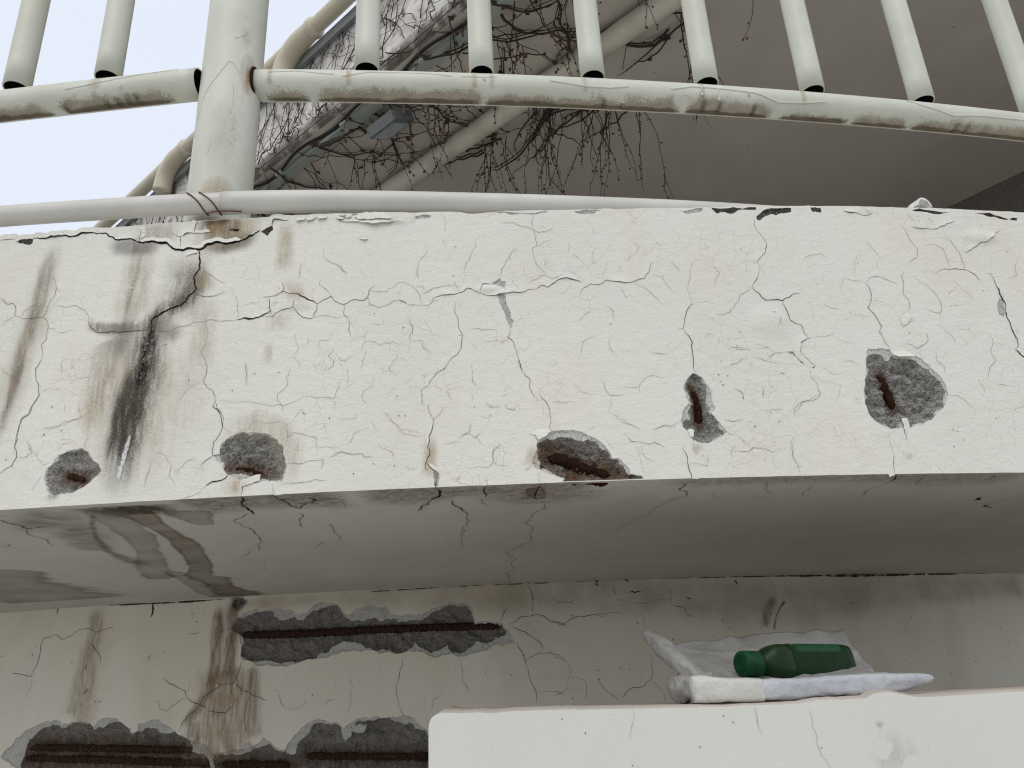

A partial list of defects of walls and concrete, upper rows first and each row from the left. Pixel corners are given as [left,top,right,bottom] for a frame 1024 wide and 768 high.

crack [844,206,873,215]
damp [5,306,39,413]
damp [96,272,207,483]
spalling [864,348,948,429]
spalling [213,432,287,483]
crack [0,214,1024,702]
spalling [529,427,644,487]
damp [89,505,259,617]
damp [700,573,986,584]
spalling [229,602,515,667]
crack [159,666,352,730]
spalling [0,715,429,768]